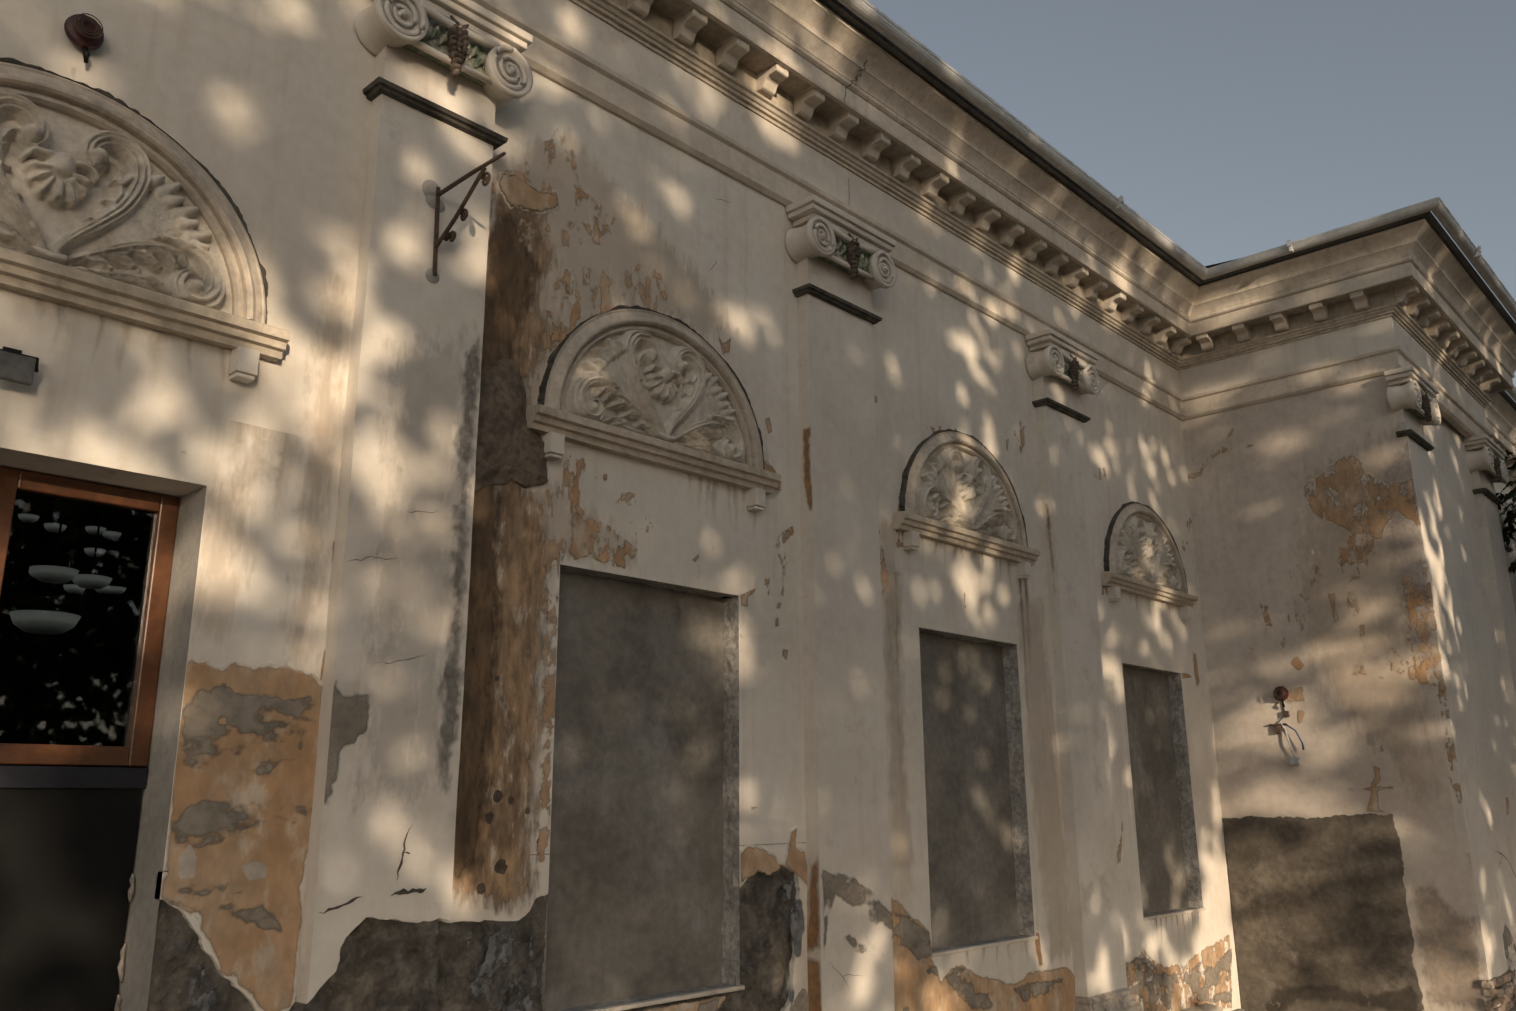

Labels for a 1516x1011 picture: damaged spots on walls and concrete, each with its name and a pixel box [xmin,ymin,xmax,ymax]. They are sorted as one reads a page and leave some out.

peeling [497,163,615,251]
peeling [542,264,667,350]
leakage [440,180,556,913]
peeling [1302,451,1421,636]
peeling [537,459,637,862]
peeling [1353,567,1462,803]
peeling [147,657,547,1011]
crack [319,824,426,914]
spalling [623,825,809,1011]
peeling [891,896,1076,1011]
peeling [1125,933,1233,1011]